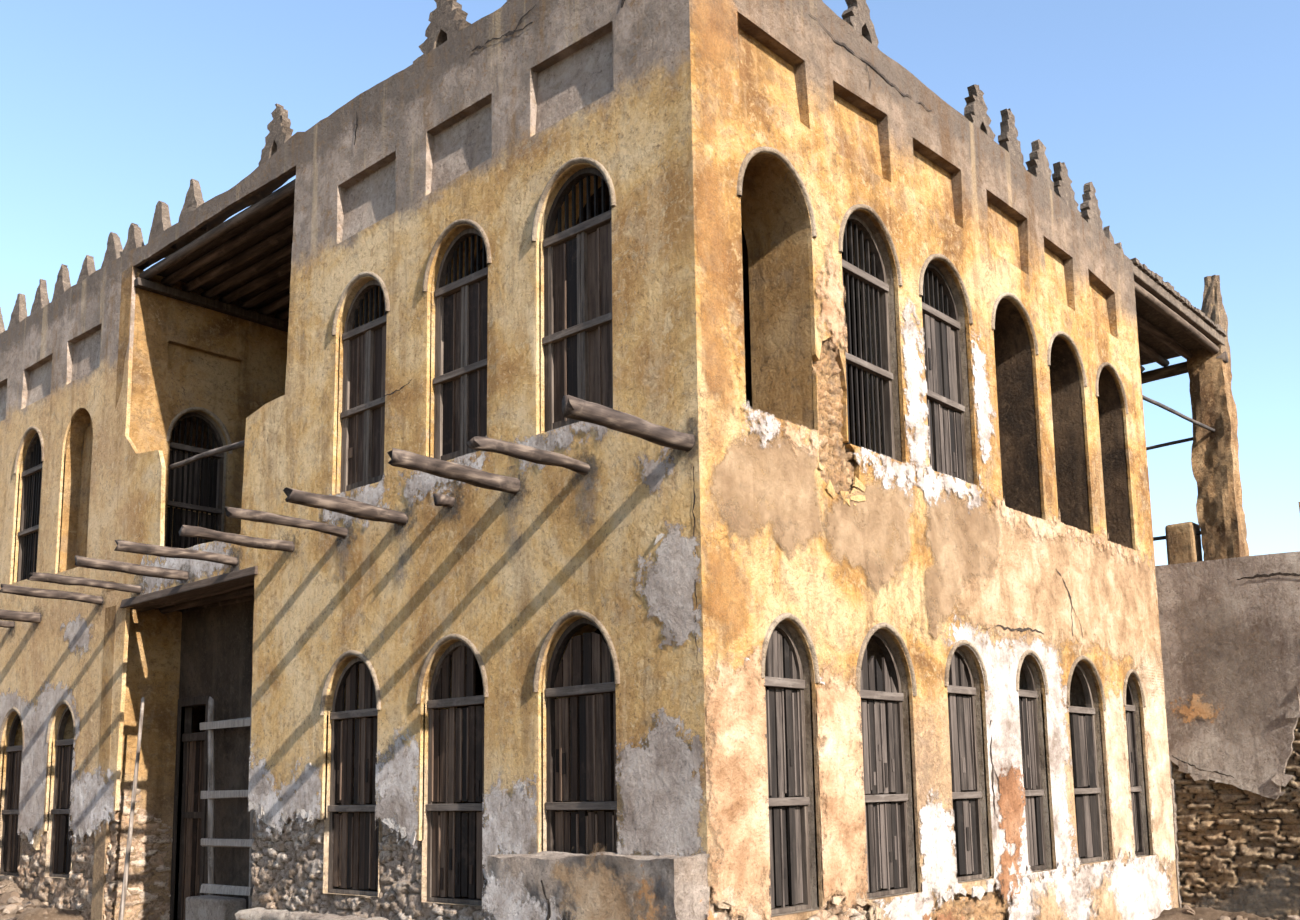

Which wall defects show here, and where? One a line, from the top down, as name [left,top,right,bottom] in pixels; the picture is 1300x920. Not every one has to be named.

peeling [630,518,702,651]
leakage [710,432,1001,639]
peeling [741,248,1300,920]
crack [1237,572,1300,580]
peeling [0,680,173,920]
spalling [239,728,562,920]
crack [541,880,551,920]
peeling [615,645,780,920]